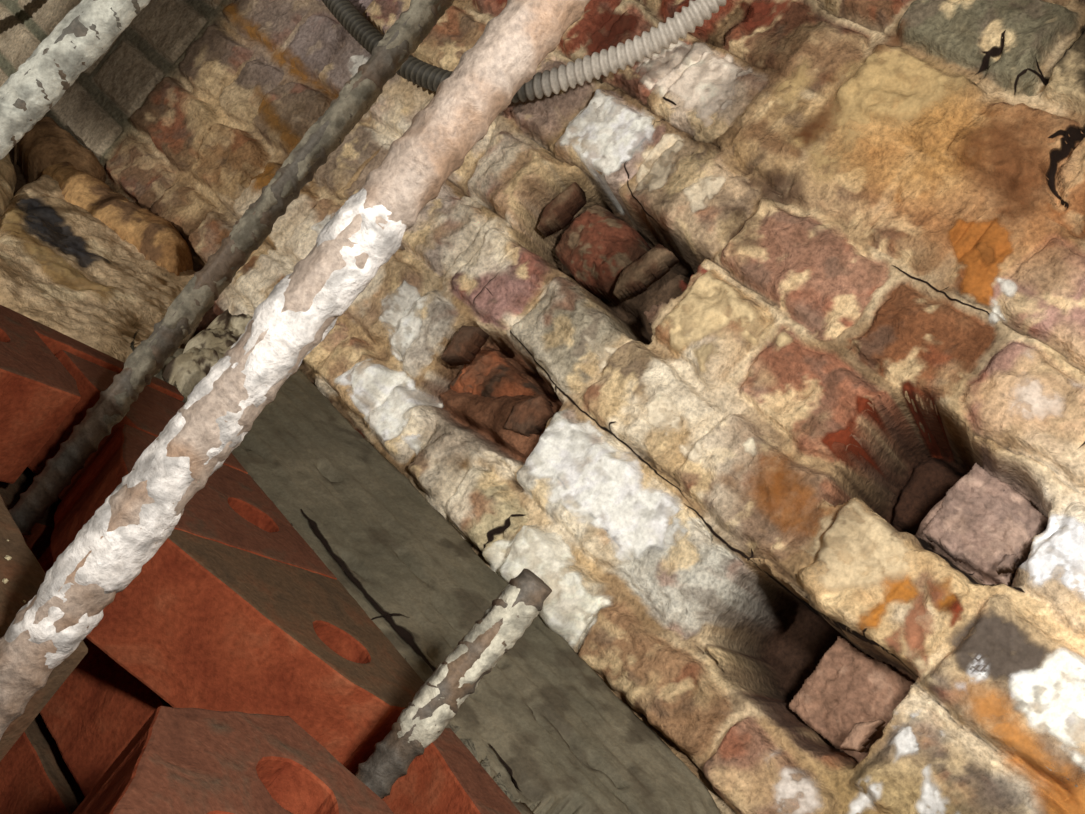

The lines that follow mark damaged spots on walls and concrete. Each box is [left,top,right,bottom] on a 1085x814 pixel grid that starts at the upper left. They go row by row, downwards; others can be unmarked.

crack [975,30,1006,75]
crack [1014,57,1050,95]
crack [1046,125,1085,209]
corrosion [949,218,1012,305]
crack [892,265,996,323]
corrosion [860,576,917,631]
corrosion [975,696,1085,814]